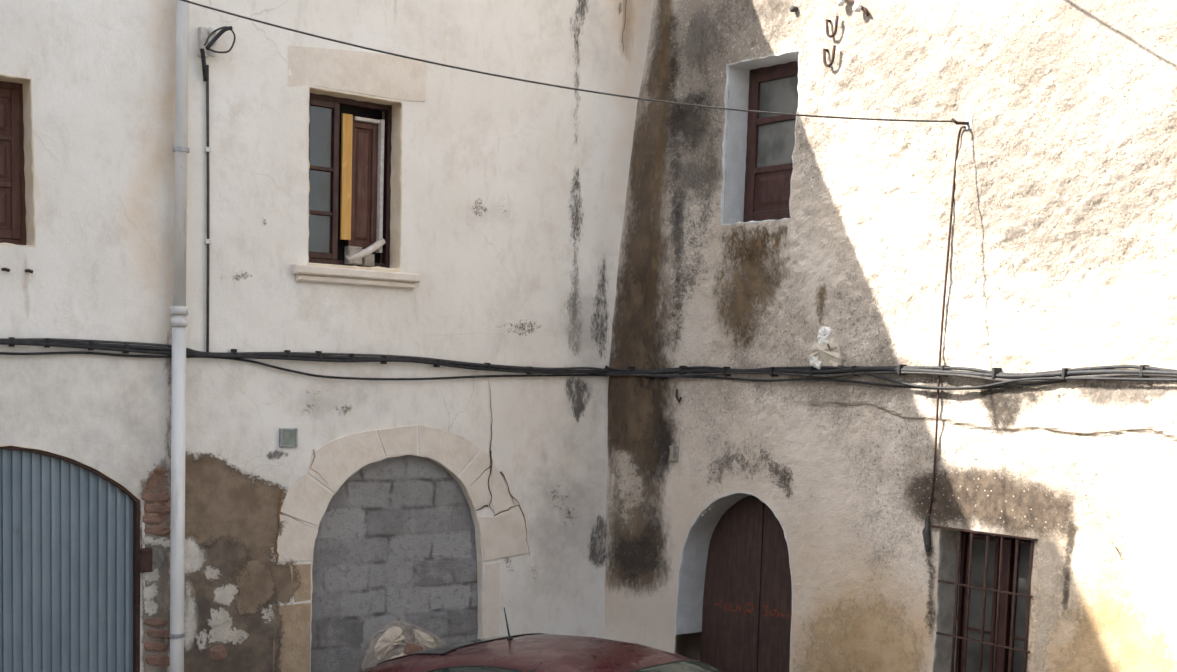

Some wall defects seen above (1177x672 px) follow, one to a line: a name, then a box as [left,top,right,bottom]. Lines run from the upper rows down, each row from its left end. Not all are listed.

crack [620,0,628,52]
damp [566,0,802,589]
spalling [140,461,171,672]
spalling [184,451,301,672]
crack [472,380,530,555]
crack [828,404,1177,457]
damp [905,466,1173,672]